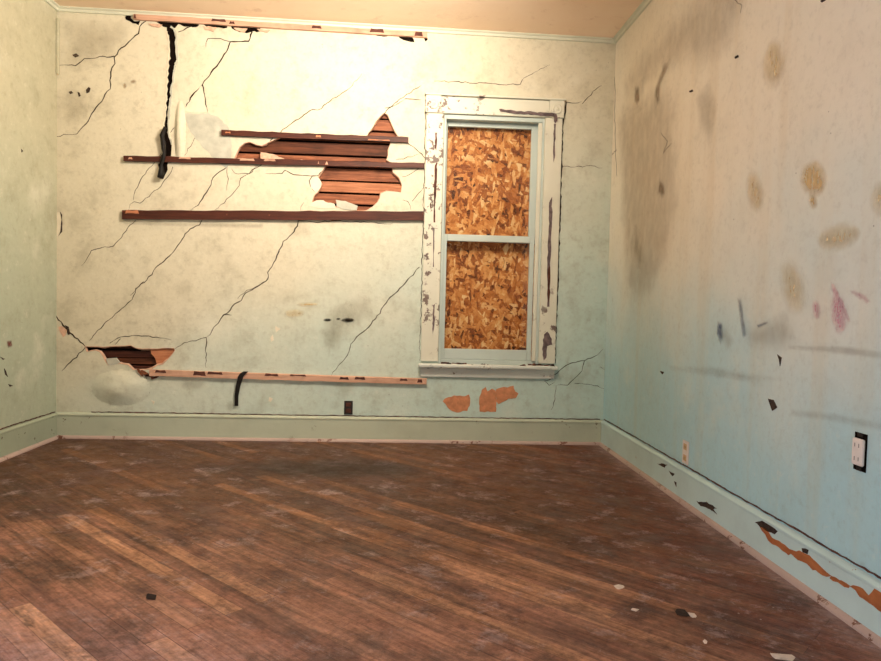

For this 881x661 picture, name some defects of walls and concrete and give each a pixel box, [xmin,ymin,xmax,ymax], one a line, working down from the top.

spalling [125,14,270,33]
crack [441,65,549,85]
crack [57,21,252,263]
spalling [184,85,402,211]
peeling [499,109,557,162]
peeling [430,162,438,267]
spalling [85,345,175,379]
crack [56,74,881,579]
peeling [542,332,552,360]
peeling [443,386,518,413]
peeling [755,521,881,612]